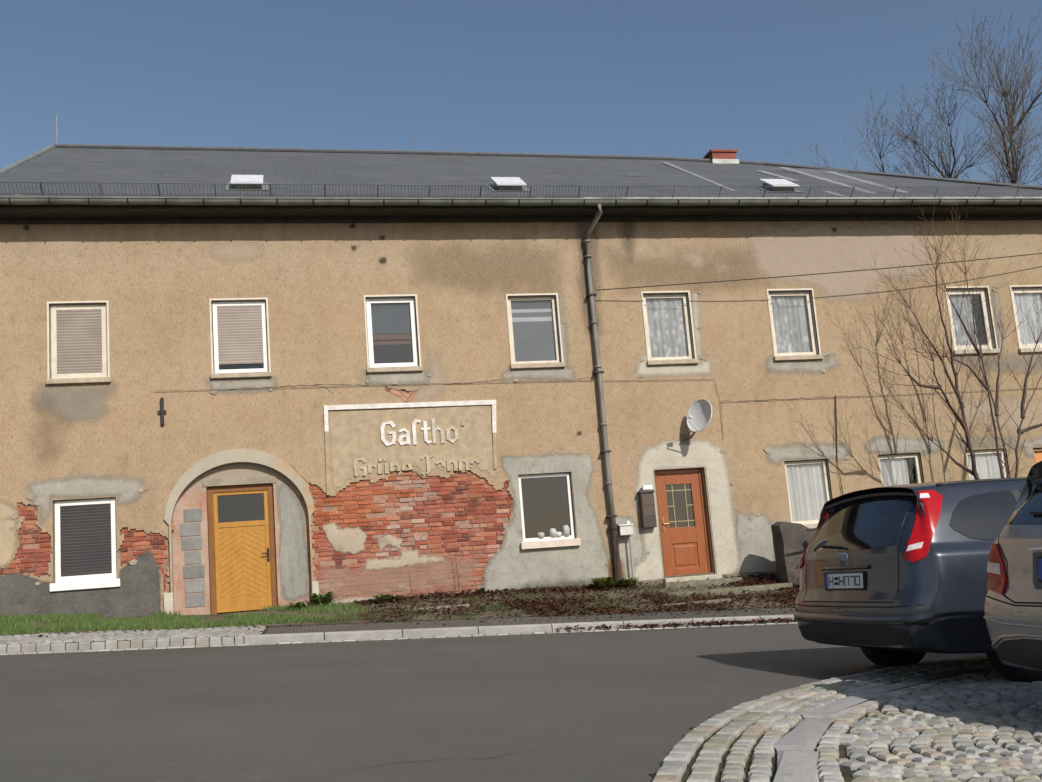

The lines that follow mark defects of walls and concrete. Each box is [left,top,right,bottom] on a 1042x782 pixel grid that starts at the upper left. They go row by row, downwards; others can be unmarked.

damp [40,389,110,419]
flaking render [0,501,53,585]
flaking render [117,516,175,593]
flaking render [300,470,515,600]